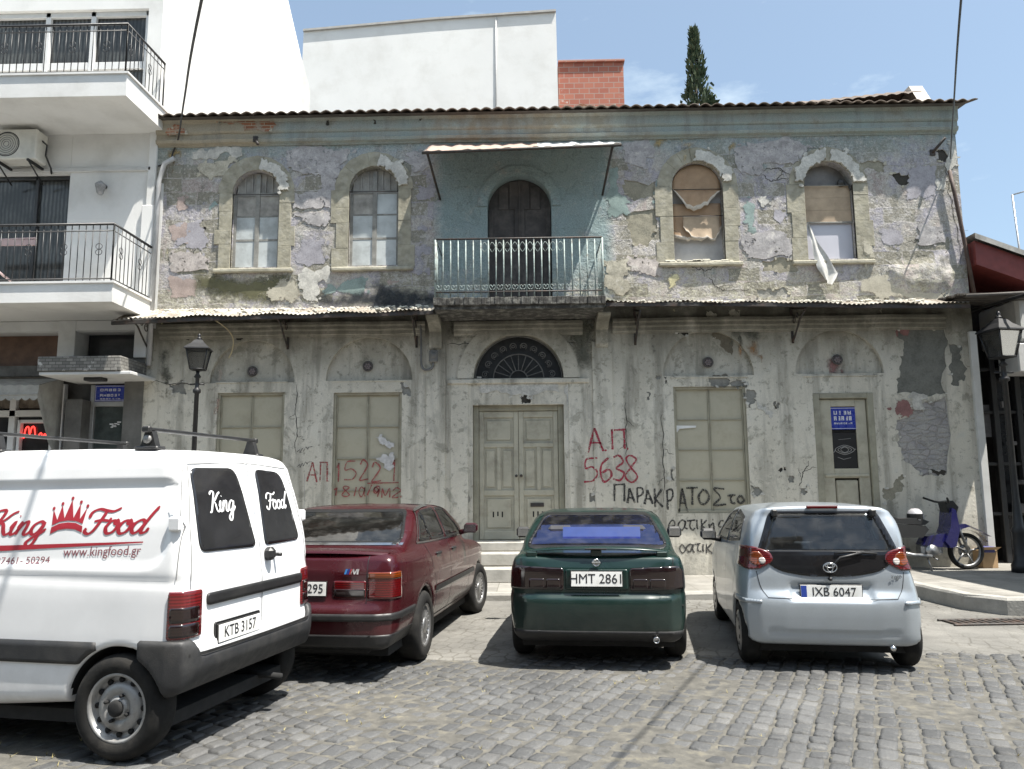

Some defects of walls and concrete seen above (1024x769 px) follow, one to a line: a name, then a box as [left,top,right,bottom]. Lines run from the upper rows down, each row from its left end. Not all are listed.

flaking render [184,146,242,180]
flaking render [619,139,655,170]
flaking render [693,136,960,200]
flaking render [169,194,217,273]
flaking render [604,180,662,296]
flaking render [879,224,950,257]
water stain [318,285,434,314]
flaking render [882,330,968,505]
crack [658,415,670,503]